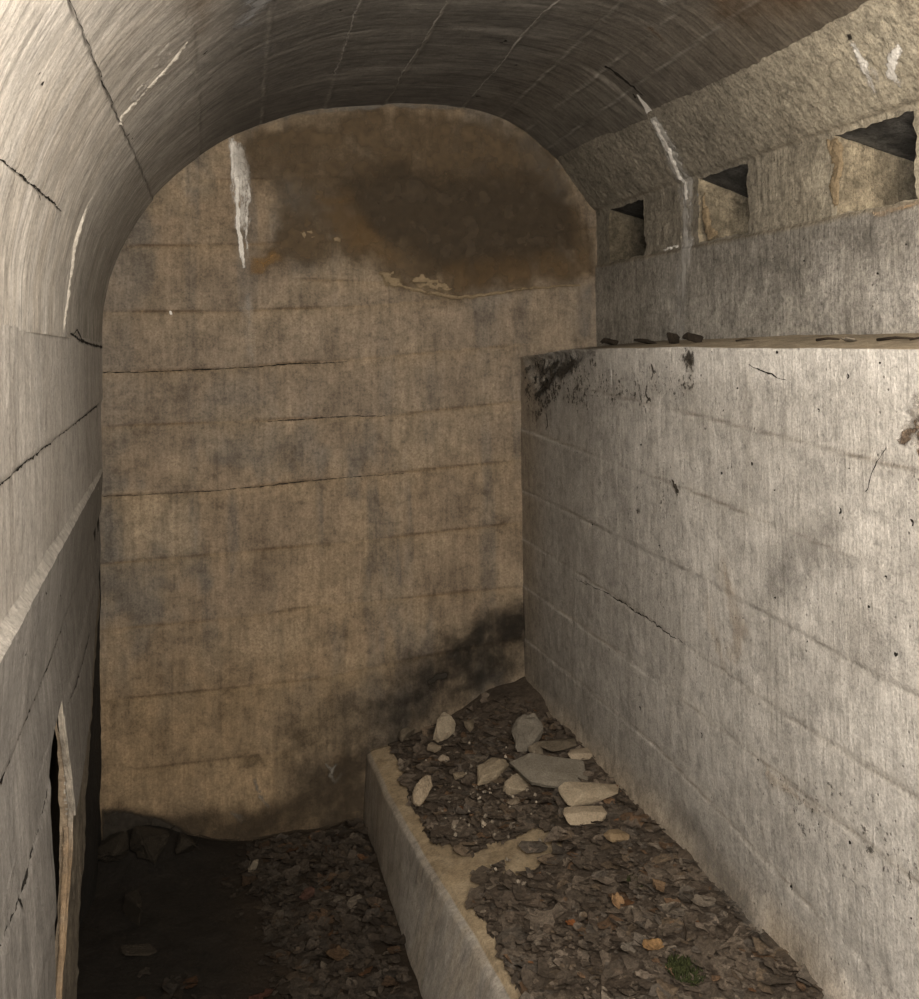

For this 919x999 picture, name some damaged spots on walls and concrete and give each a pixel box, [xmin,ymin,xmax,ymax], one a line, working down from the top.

crack [69,0,133,149]
leakage [851,44,875,92]
leakage [886,44,902,87]
crack [0,159,61,211]
leakage [229,103,593,300]
leakage [637,95,693,337]
crack [0,404,98,485]
leakage [373,604,525,748]